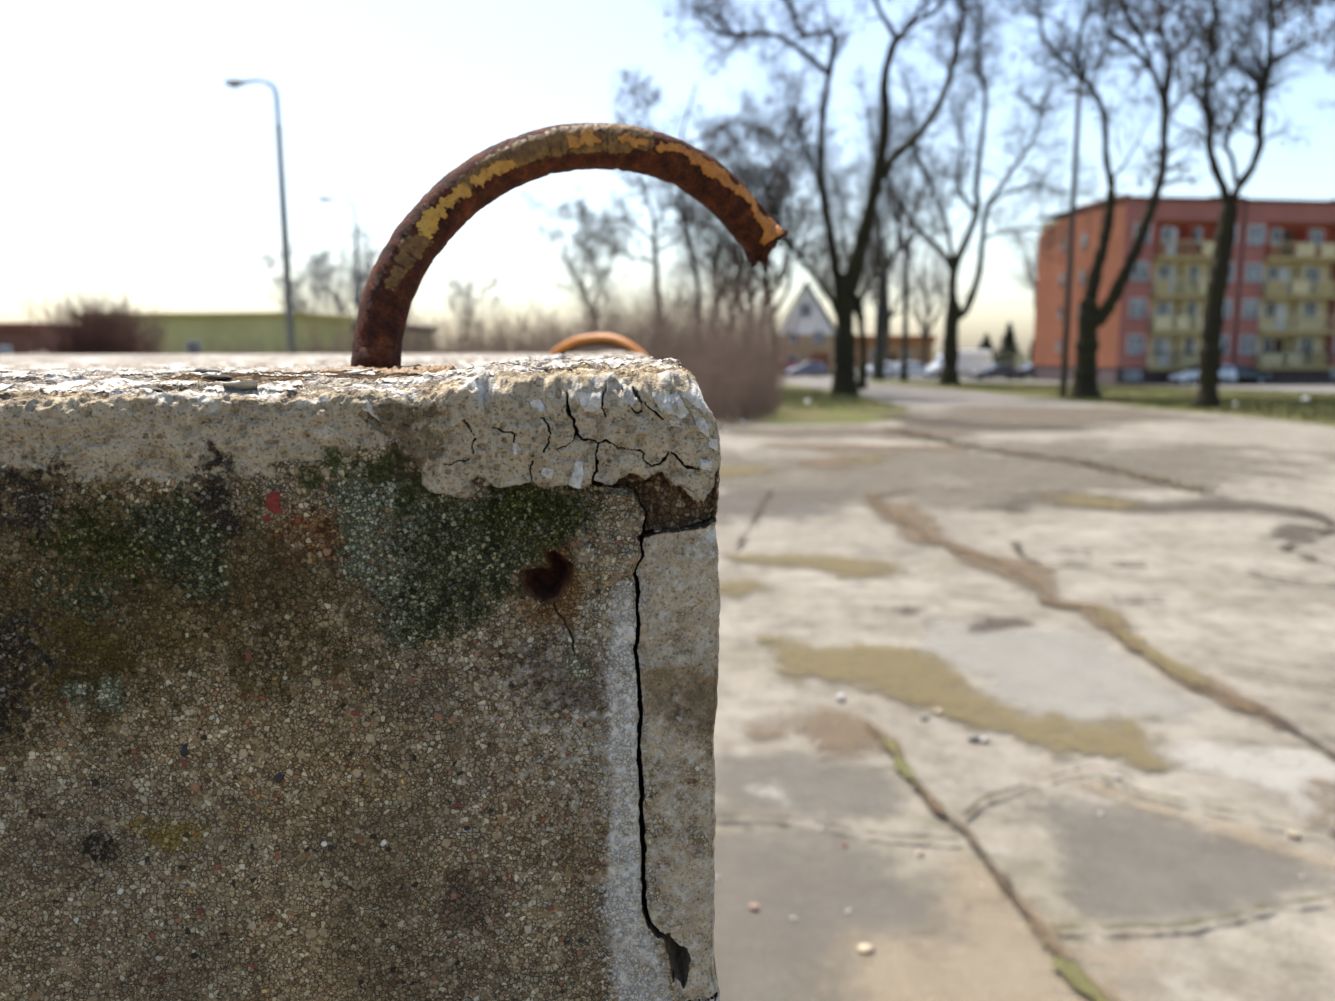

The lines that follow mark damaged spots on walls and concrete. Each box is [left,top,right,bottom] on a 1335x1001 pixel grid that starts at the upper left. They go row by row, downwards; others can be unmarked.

peeling [577,391,603,415]
crack [444,386,772,989]
spalling [600,390,719,530]
crack [864,488,1335,758]
crack [886,428,1335,564]
crack [715,722,1335,1000]